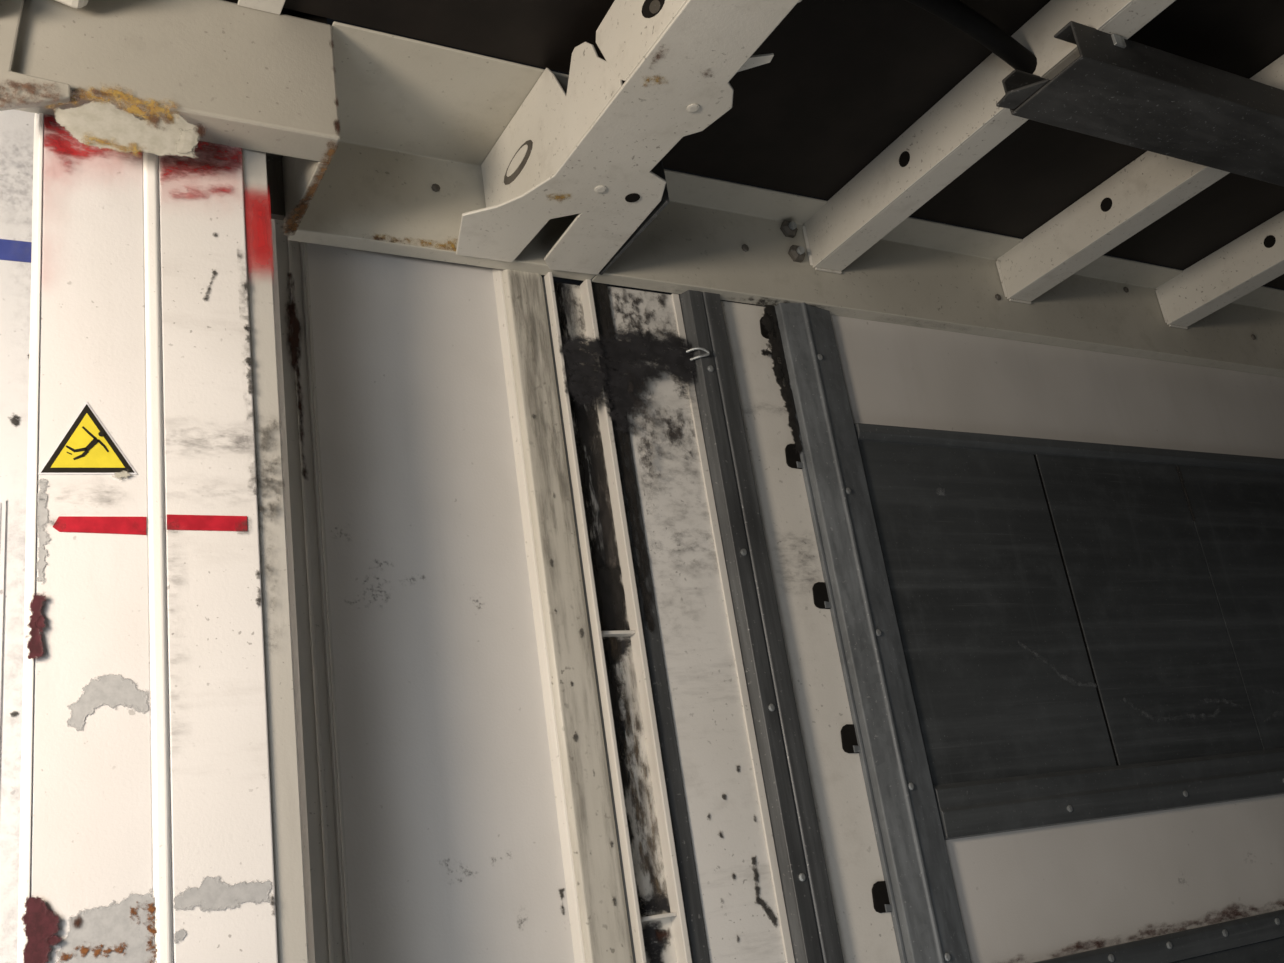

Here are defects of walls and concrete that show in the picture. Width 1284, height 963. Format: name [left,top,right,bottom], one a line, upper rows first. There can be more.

rust [0,81,176,128]
peeling [55,101,205,158]
rust [282,100,340,235]
rust [374,235,456,251]
peeling [244,325,253,394]
water stain [553,281,697,477]
water stain [575,434,630,631]
peeling [26,478,51,659]
peeling [67,674,149,731]
peeling [21,893,157,963]
peeling [173,876,274,915]